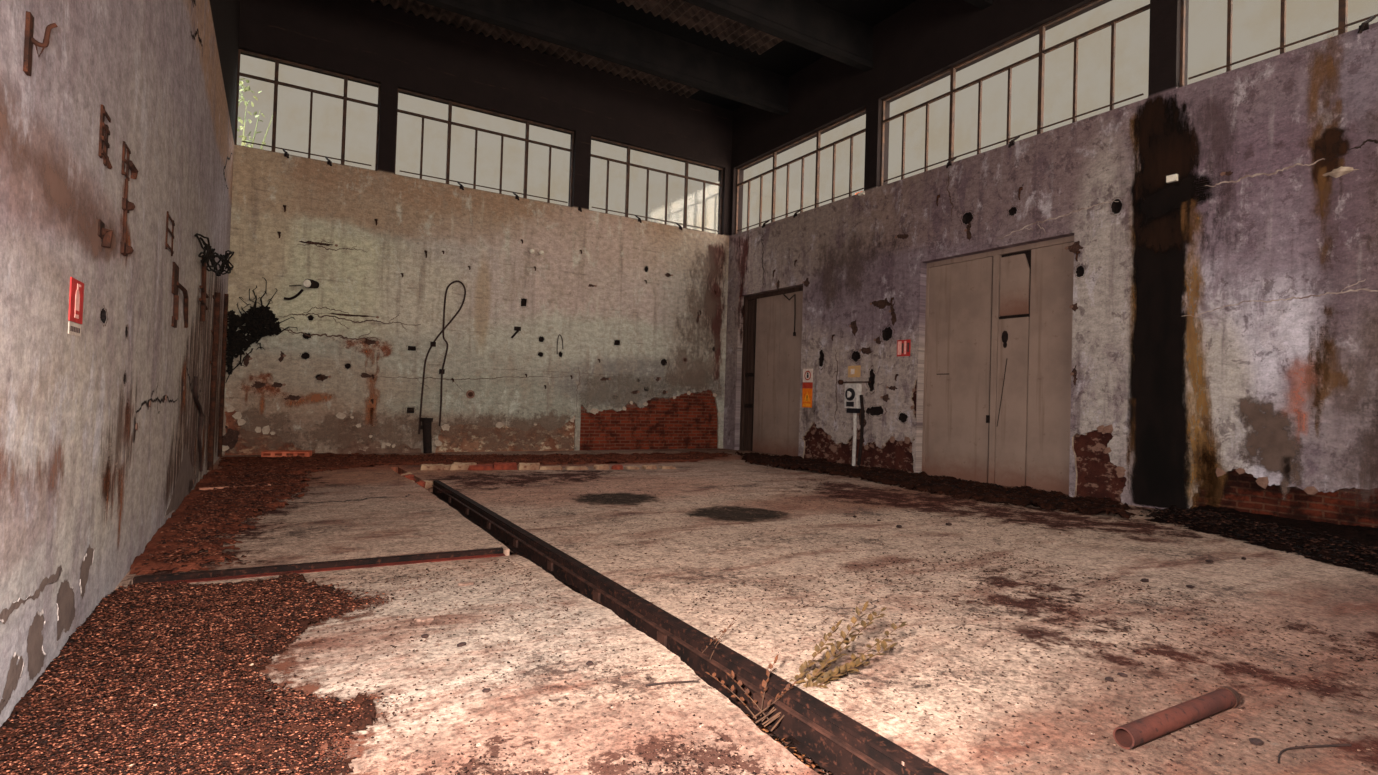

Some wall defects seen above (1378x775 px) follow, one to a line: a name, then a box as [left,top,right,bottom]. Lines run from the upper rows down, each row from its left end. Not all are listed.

crack [1205,139,1378,187]
leakage [1127,95,1233,509]
crack [1184,280,1378,317]
crack [136,363,204,442]
rust [241,372,332,413]
rust [332,337,393,426]
flaking render [802,298,917,473]
leakage [37,443,64,491]
leakage [101,385,137,543]
flaking render [1072,424,1127,504]
flaking render [1190,468,1378,528]
peeling [0,544,95,714]